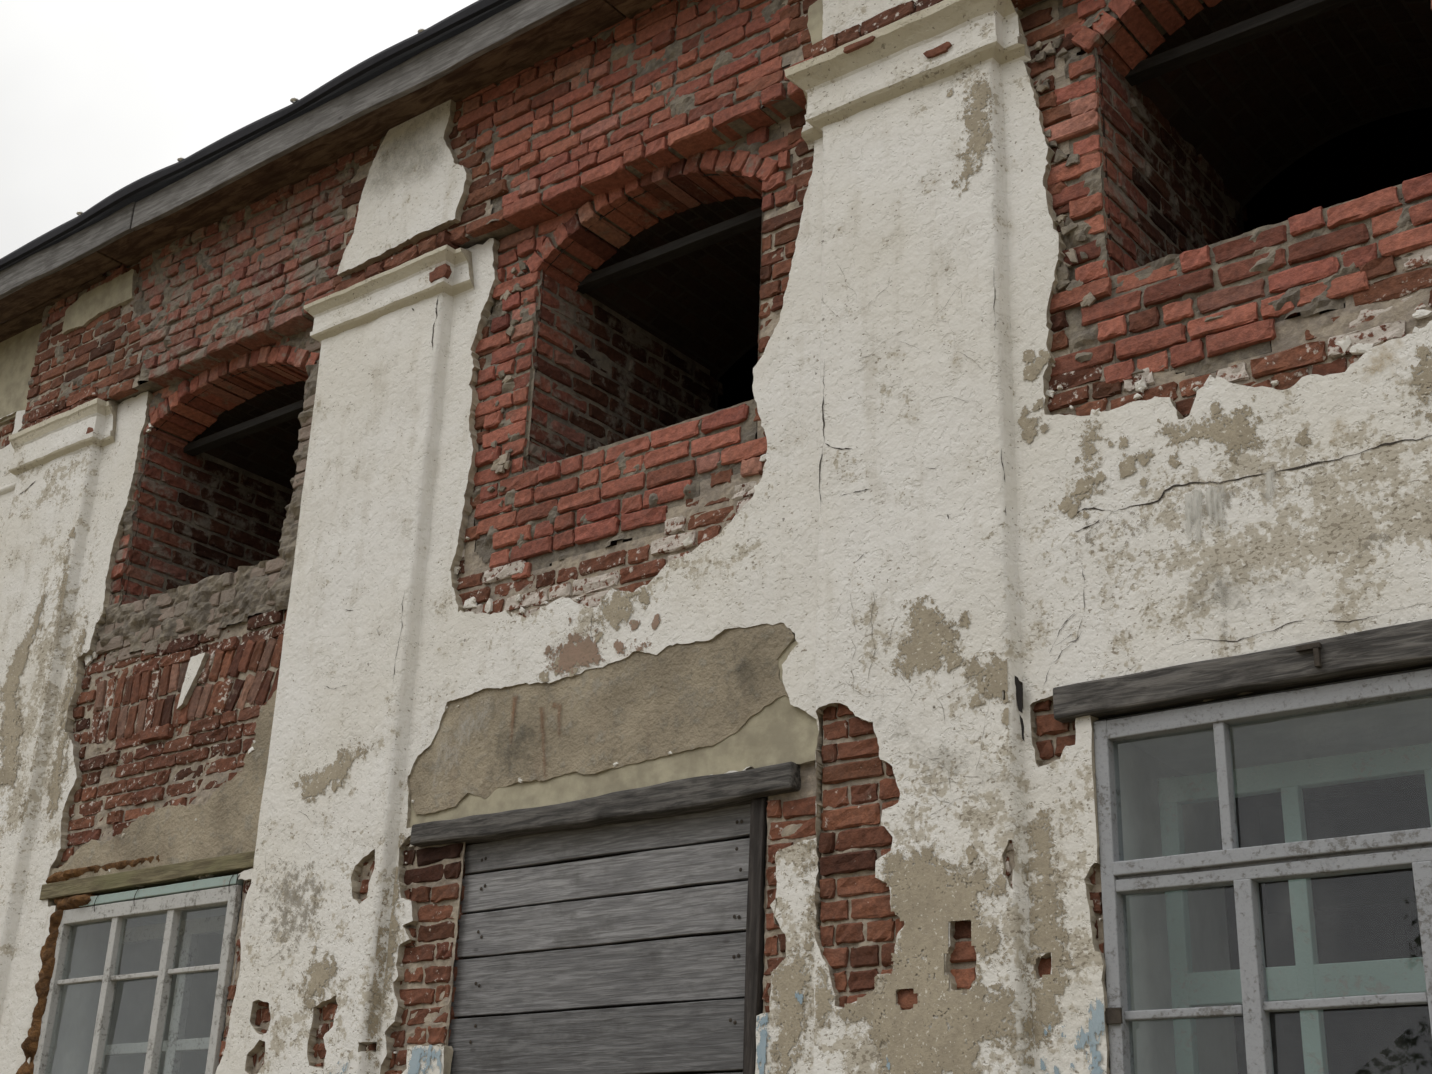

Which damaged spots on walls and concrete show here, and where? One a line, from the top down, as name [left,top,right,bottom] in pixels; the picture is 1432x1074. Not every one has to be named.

spalling [758,109,814,361]
spalling [1020,0,1107,308]
spalling [0,527,288,888]
peeling [409,261,796,815]
peeling [890,595,1076,766]
crack [1045,571,1085,682]
spalling [1013,245,1432,551]
crack [1075,435,1432,532]
spalling [252,1001,271,1074]
peeling [298,945,342,1074]
spalling [358,833,468,1074]
peeling [757,704,1081,1074]